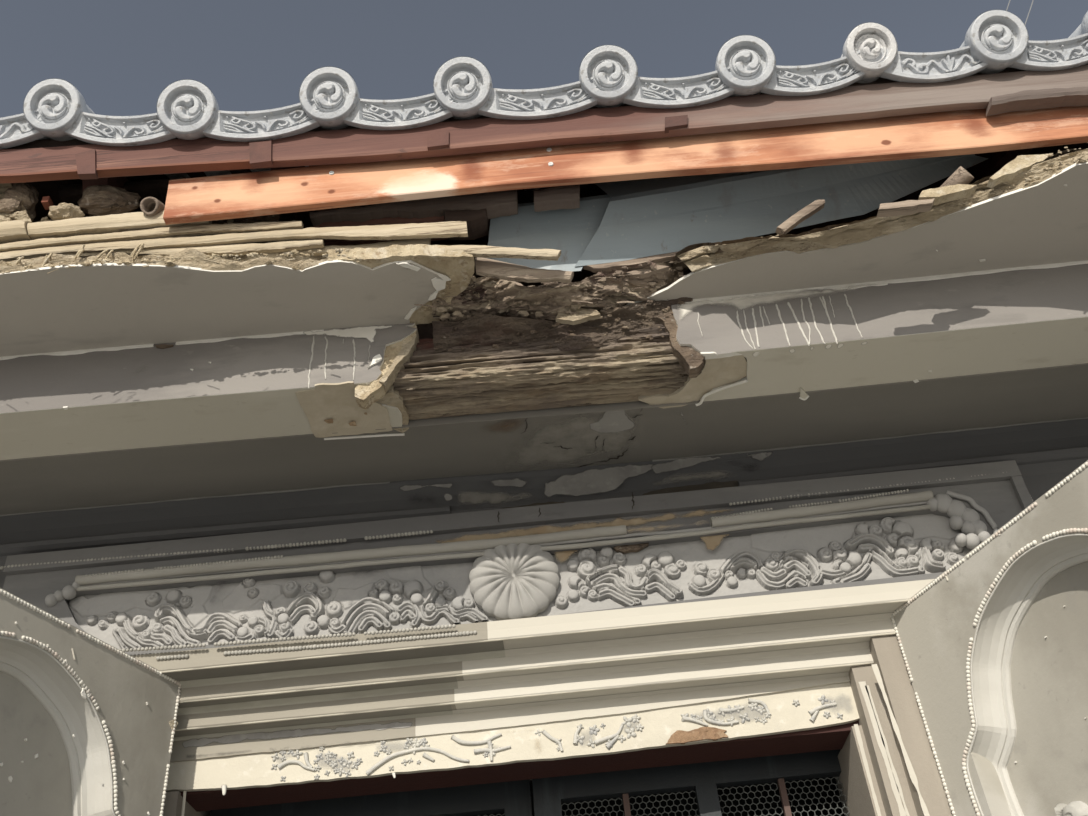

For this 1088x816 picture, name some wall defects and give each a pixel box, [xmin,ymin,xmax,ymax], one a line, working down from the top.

spalling [0,142,1088,440]
peeling [400,457,738,511]
spalling [665,727,728,745]